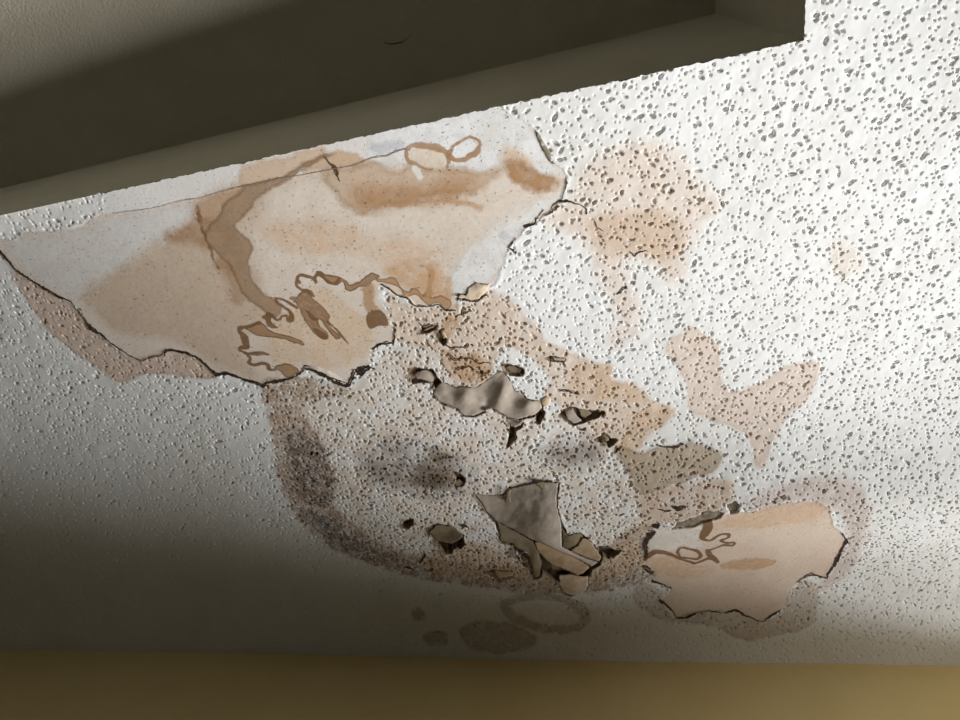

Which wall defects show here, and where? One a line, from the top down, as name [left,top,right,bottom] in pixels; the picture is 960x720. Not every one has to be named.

peeling [0,107,567,385]
damp [15,136,776,593]
damp [668,327,819,467]
peeling [645,495,844,620]